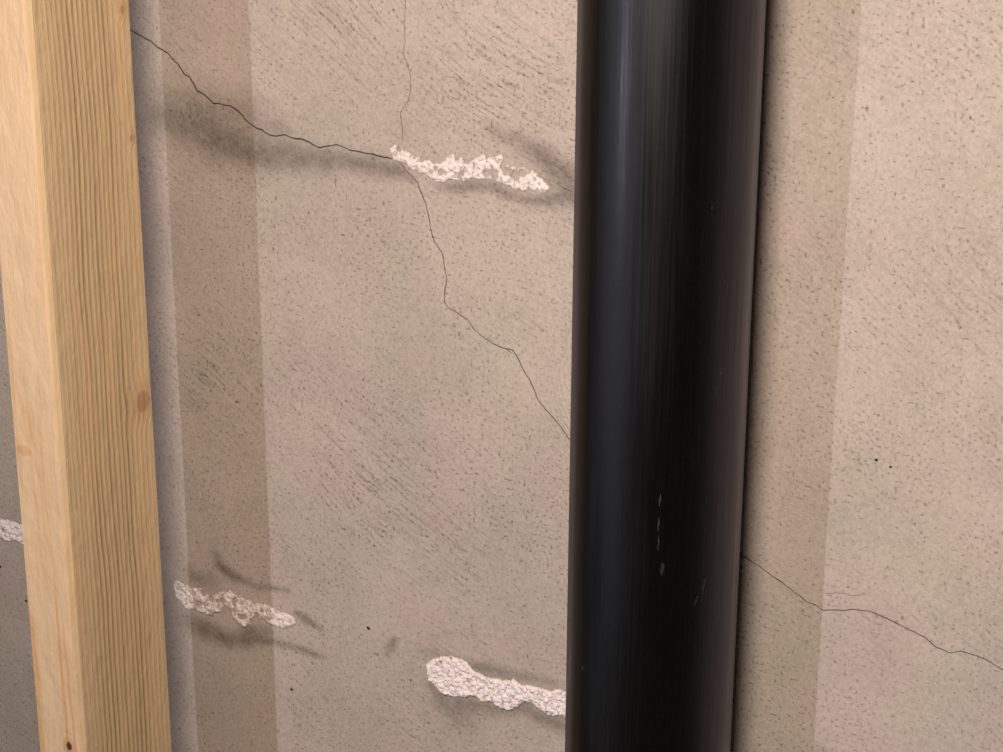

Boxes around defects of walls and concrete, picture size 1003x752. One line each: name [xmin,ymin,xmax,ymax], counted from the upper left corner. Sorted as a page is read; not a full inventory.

crack [130,30,392,159]
damp [389,145,550,195]
crack [414,179,568,437]
damp [0,518,23,544]
damp [173,579,296,628]
crack [740,554,1003,670]
damp [426,656,566,717]